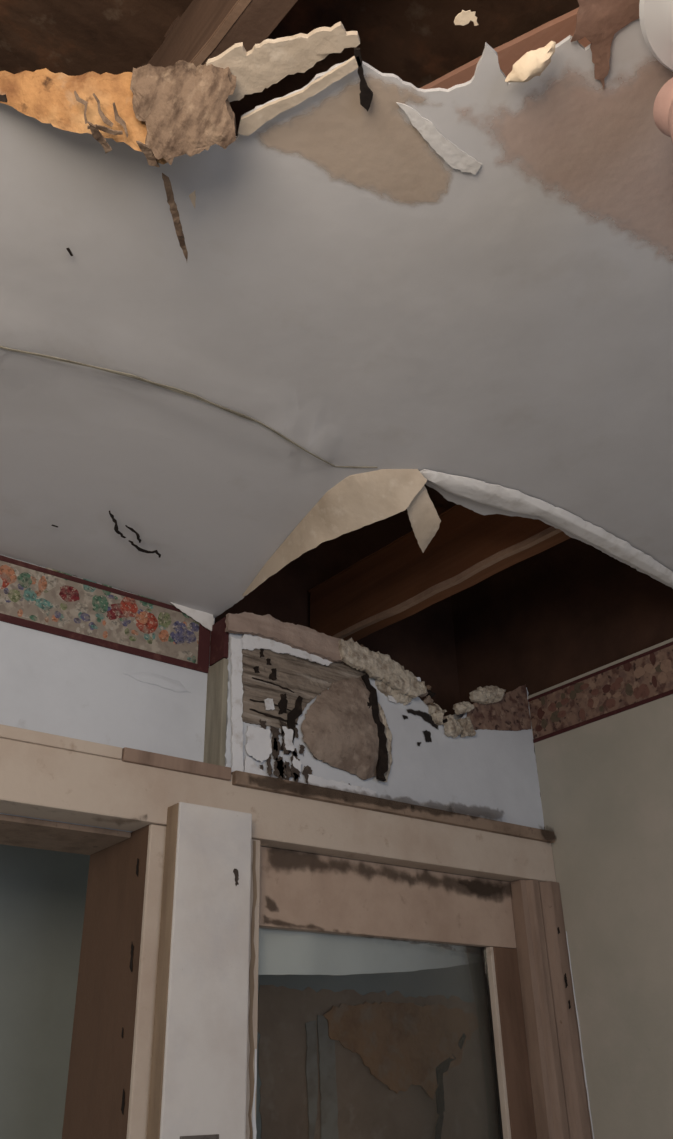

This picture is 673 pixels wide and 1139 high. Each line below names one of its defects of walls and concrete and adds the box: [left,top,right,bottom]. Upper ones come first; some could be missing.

peeling [261,78,450,203]
crack [0,346,378,468]
peeling [230,637,377,797]
spalling [338,637,506,738]
flaking render [233,840,481,1139]